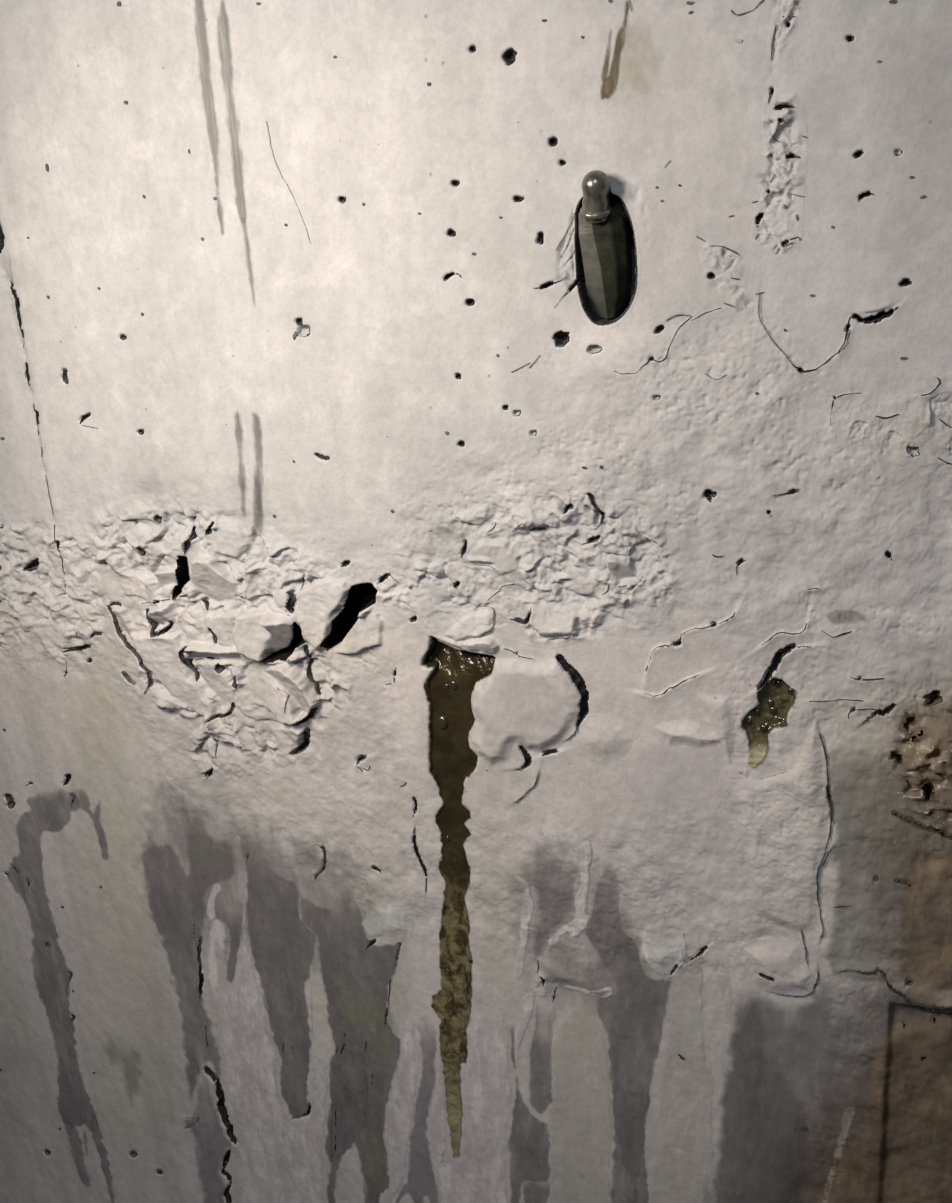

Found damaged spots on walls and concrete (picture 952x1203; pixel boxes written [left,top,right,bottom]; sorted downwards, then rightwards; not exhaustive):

crack [615,307,721,374]
crack [758,295,898,373]
crack [54,525,65,583]
spalling [172,556,190,601]
spalling [259,622,306,663]
spalling [320,583,377,651]
crack [809,677,895,723]
crack [785,732,952,1013]
damp [144,637,952,1203]
damp [8,792,114,1203]